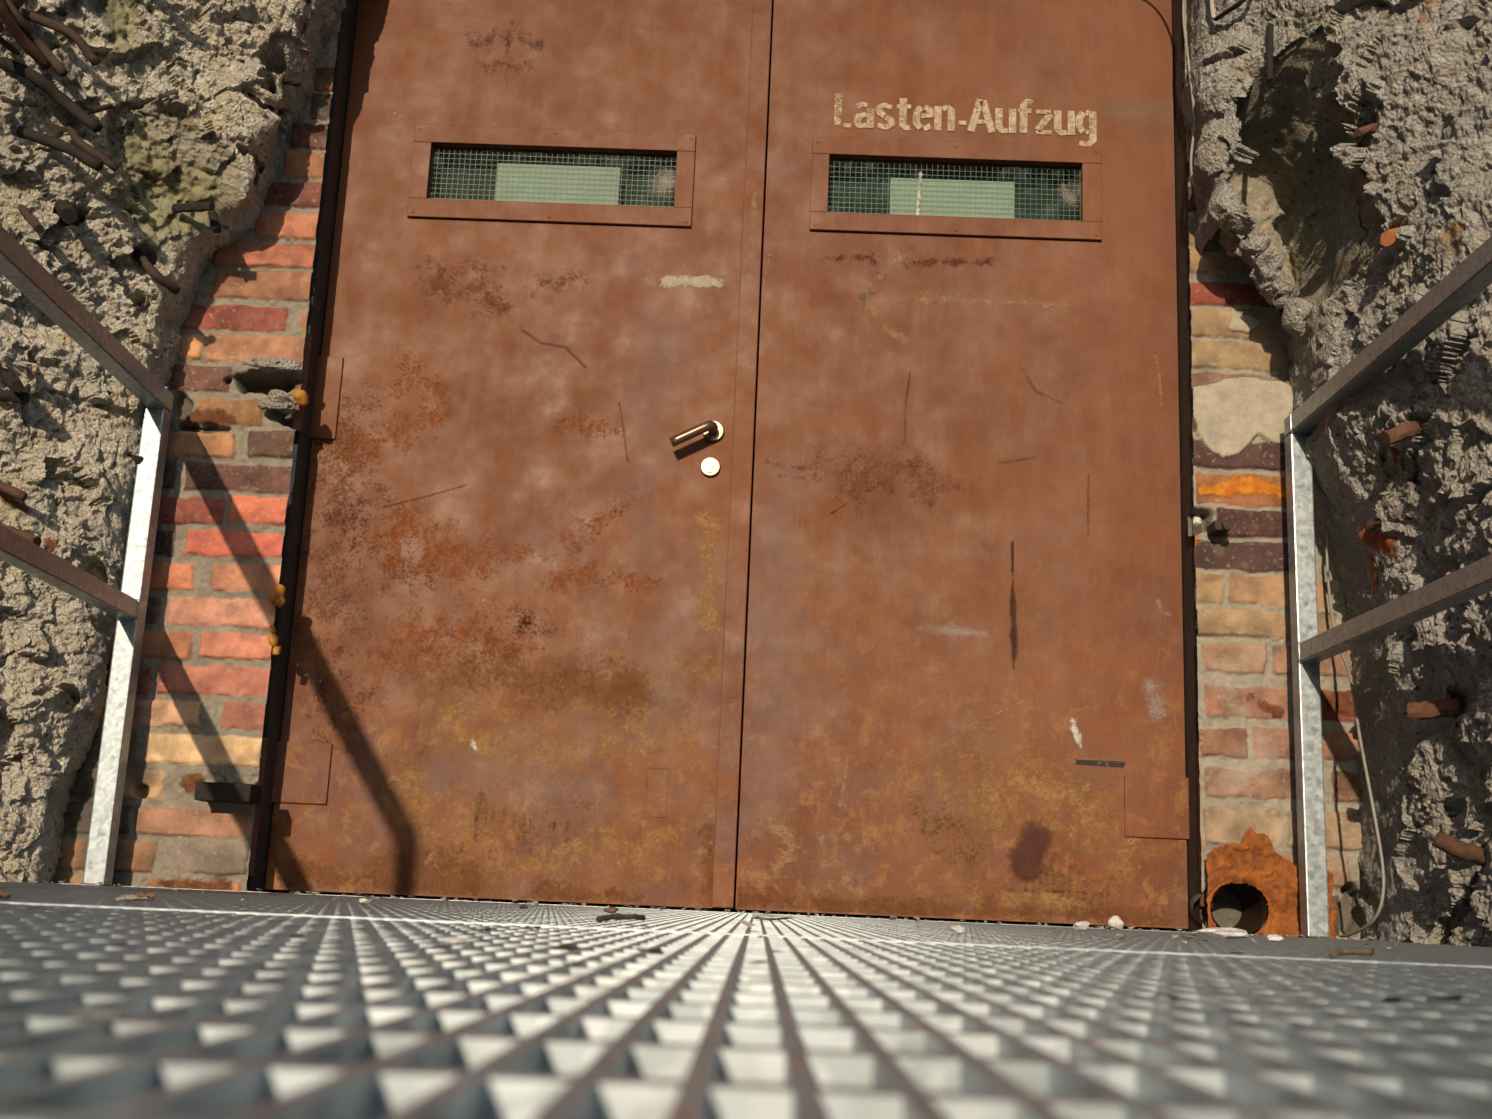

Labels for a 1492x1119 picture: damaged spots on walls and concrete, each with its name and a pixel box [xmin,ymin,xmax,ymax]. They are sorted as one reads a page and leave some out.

spalling [1266,18,1274,83]
spalling [1304,56,1342,114]
spalling [1345,108,1380,148]
rust [1198,475,1287,500]